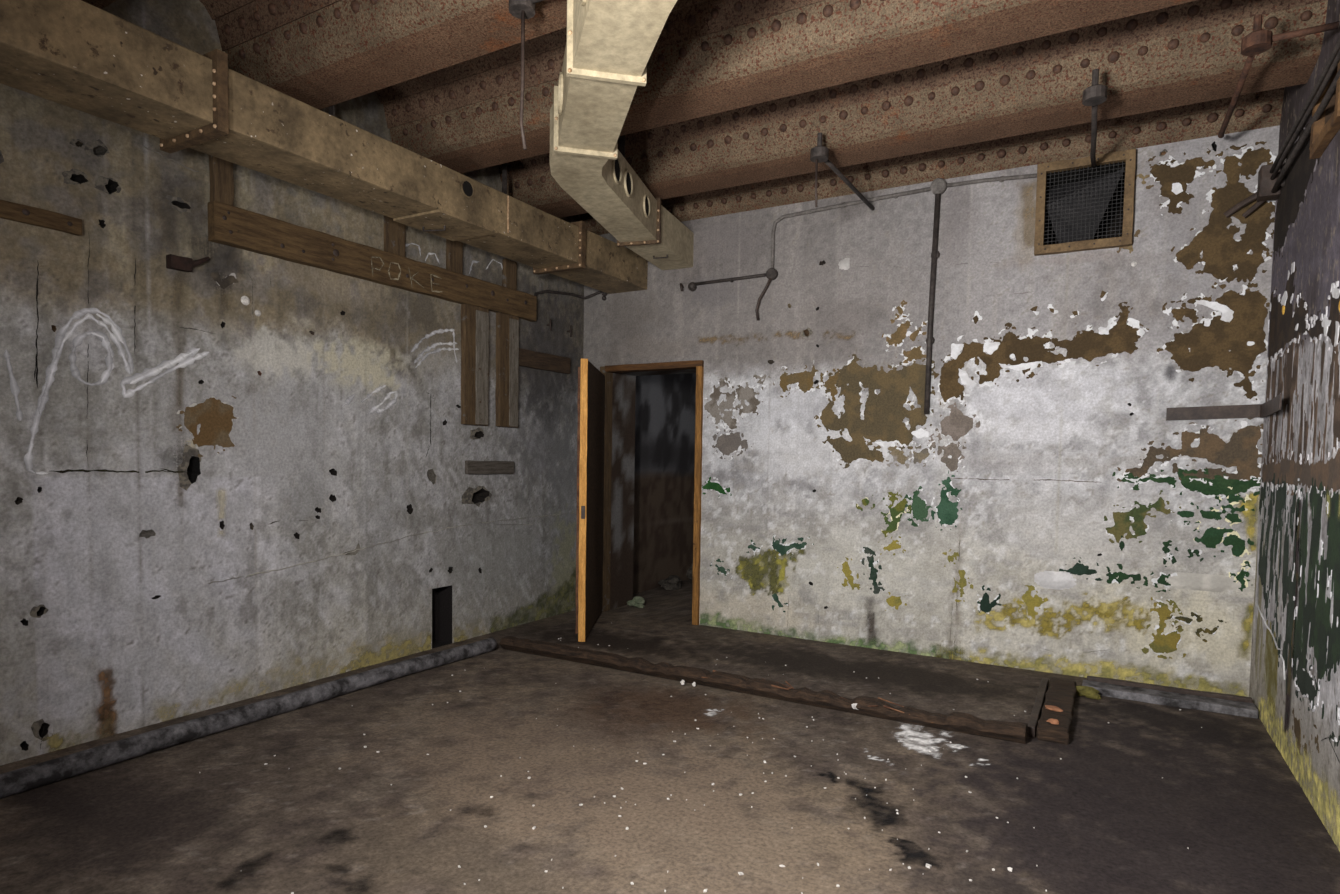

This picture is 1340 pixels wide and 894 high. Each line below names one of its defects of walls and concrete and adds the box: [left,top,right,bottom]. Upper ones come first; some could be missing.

flaking render [176,380,239,491]
peeling [702,291,1149,611]
peeling [1059,118,1340,763]
peeling [942,549,1049,622]
rust [97,670,117,738]
spalling [1045,705,1063,725]